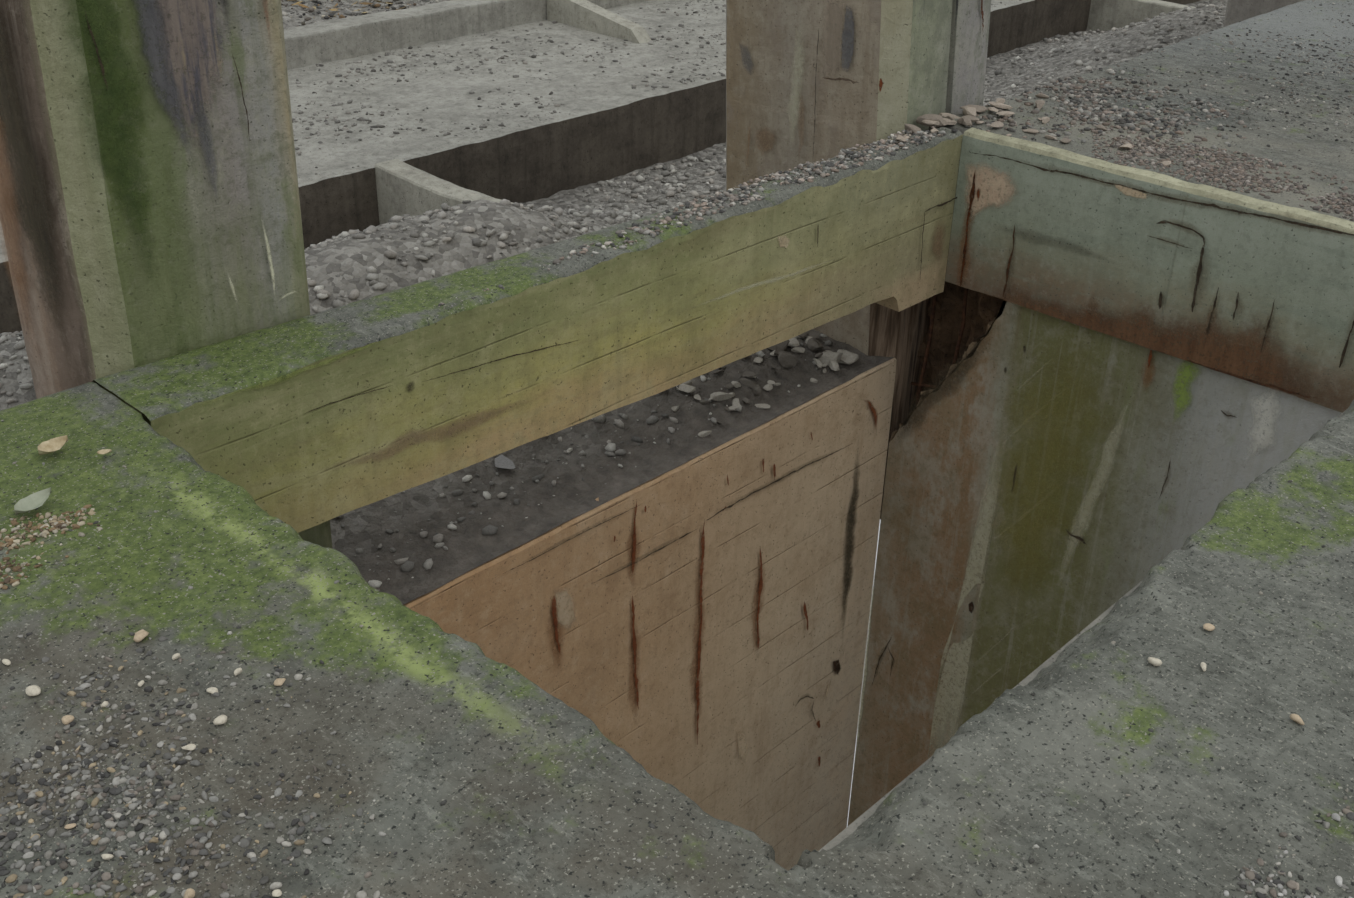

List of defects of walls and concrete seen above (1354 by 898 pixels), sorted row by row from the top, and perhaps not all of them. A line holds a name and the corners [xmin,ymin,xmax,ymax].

rust [960,172,980,286]
crack [974,153,1354,334]
crack [1261,300,1275,352]
crack [1339,321,1354,368]
rust [632,502,646,574]
leakage [843,472,859,612]
rust [696,521,705,745]